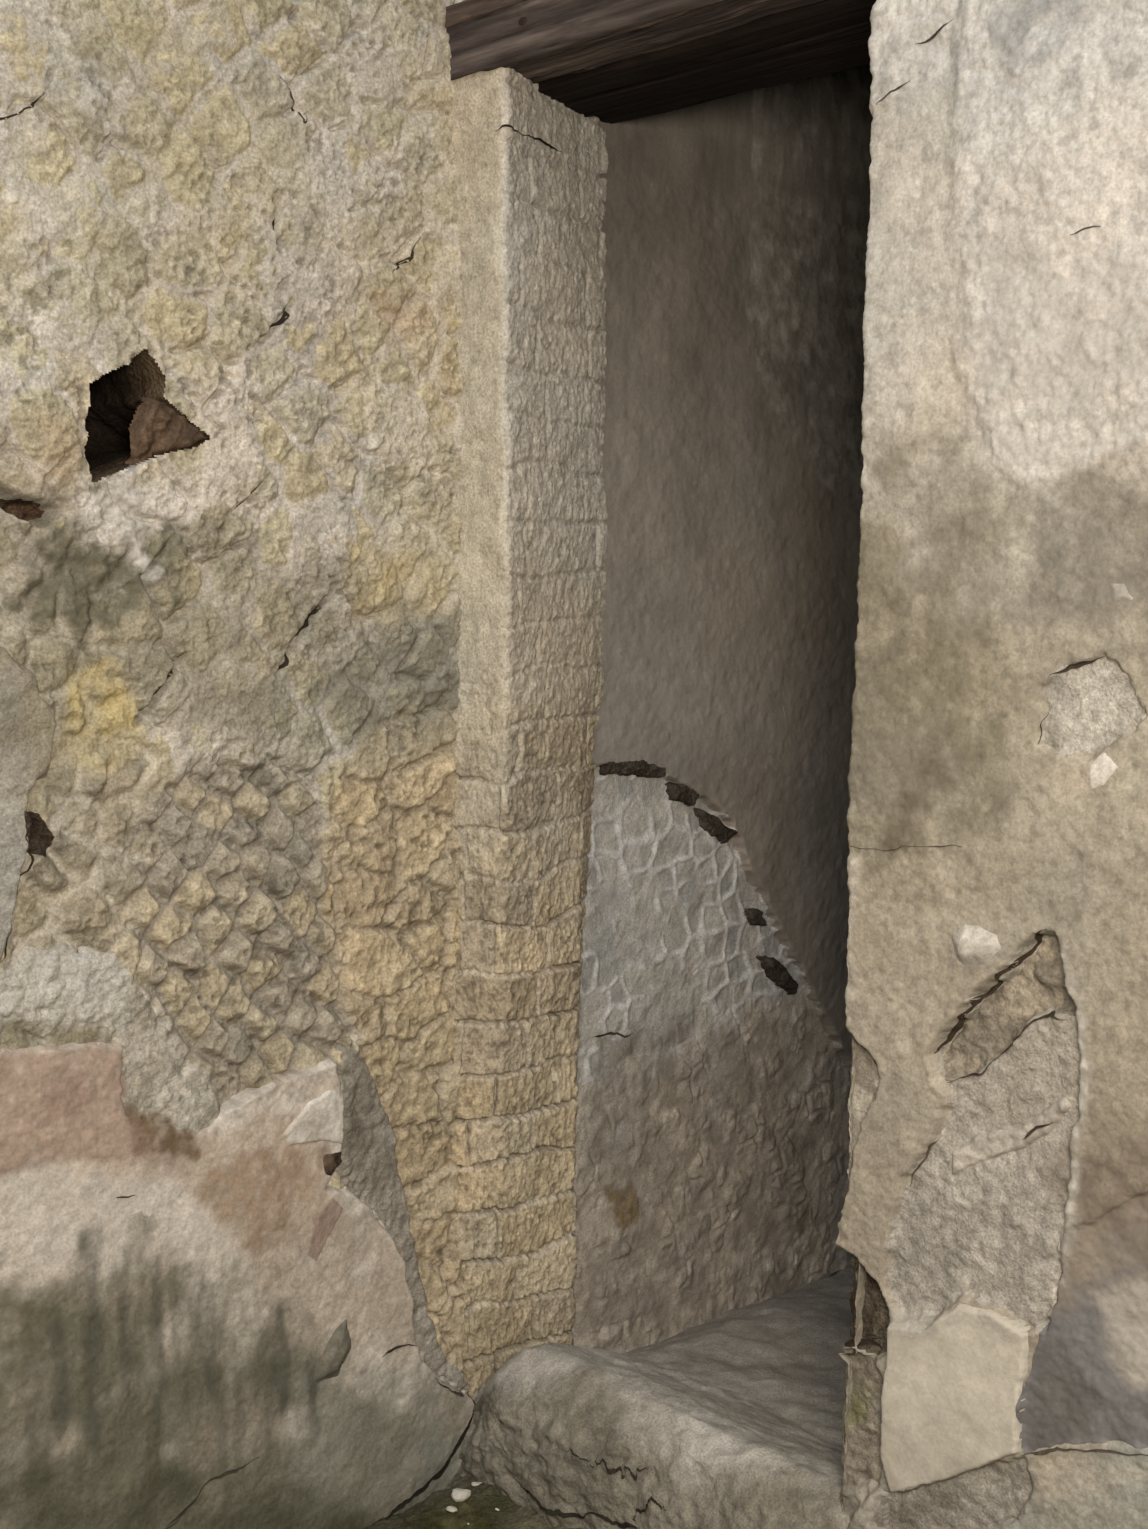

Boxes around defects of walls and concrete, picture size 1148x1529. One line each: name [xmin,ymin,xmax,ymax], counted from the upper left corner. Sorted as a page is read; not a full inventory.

spalling [84,349,210,482]
flaking render [1110,583,1133,601]
flaking render [1038,656,1147,789]
flaking render [571,760,1148,1529]